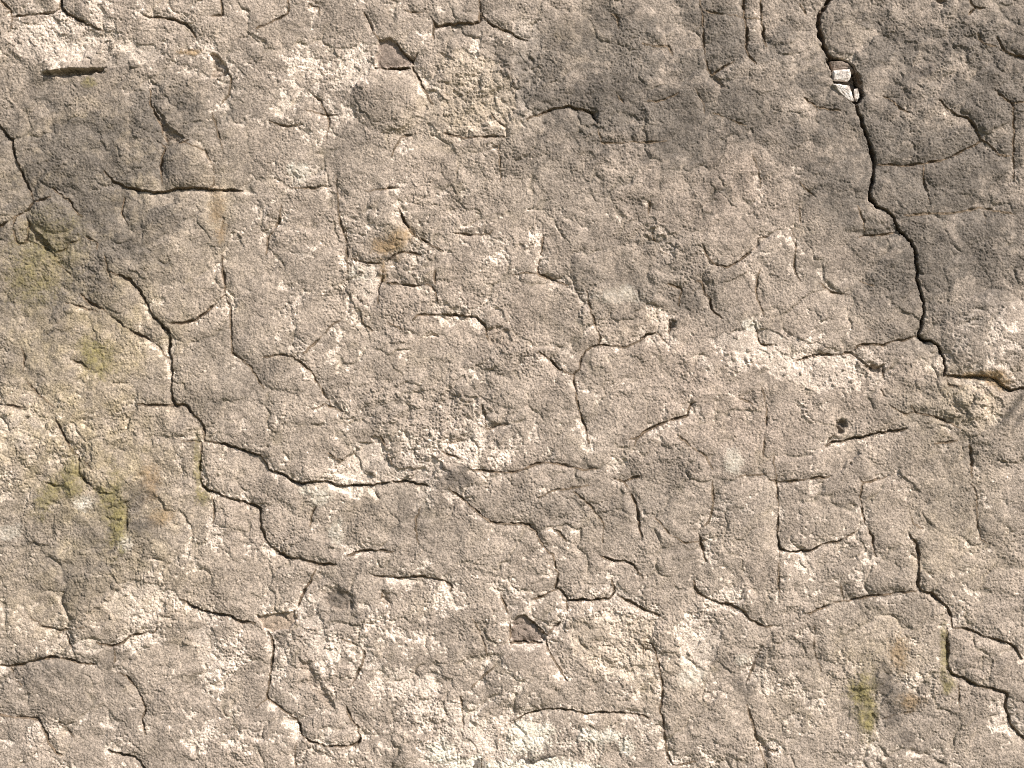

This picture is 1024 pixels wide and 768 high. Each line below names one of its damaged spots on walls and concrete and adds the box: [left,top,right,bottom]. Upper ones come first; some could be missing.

crack [0,0,104,31]
crack [143,0,224,38]
crack [256,0,320,29]
crack [364,0,528,105]
crack [618,0,767,126]
spalling [825,58,856,103]
crack [797,0,1024,392]
crack [0,74,887,768]
crack [825,405,987,544]
crack [808,518,1024,740]